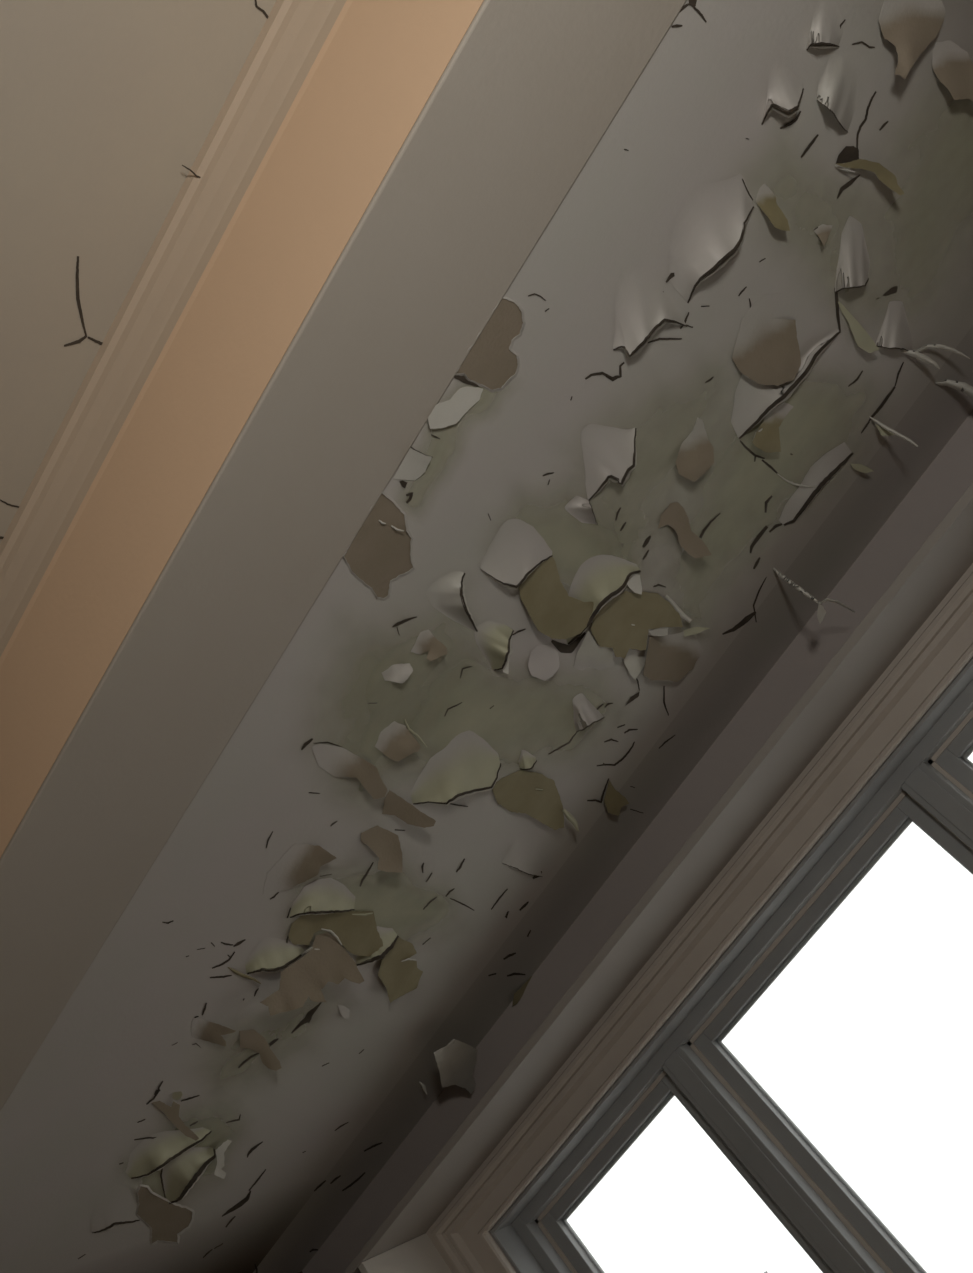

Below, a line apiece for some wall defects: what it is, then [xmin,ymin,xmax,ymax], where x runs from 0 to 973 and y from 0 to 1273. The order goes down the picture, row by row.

crack [255,0,269,19]
peeling [879,0,973,101]
crack [64,256,103,347]
flaking render [428,297,526,439]
flaking render [342,492,416,601]
peeling [382,629,447,683]
peeling [513,555,710,682]
peeling [301,719,436,873]
peeling [492,770,579,832]
peeling [260,911,423,1019]
peeling [434,1039,477,1094]
flaking render [135,1184,195,1245]